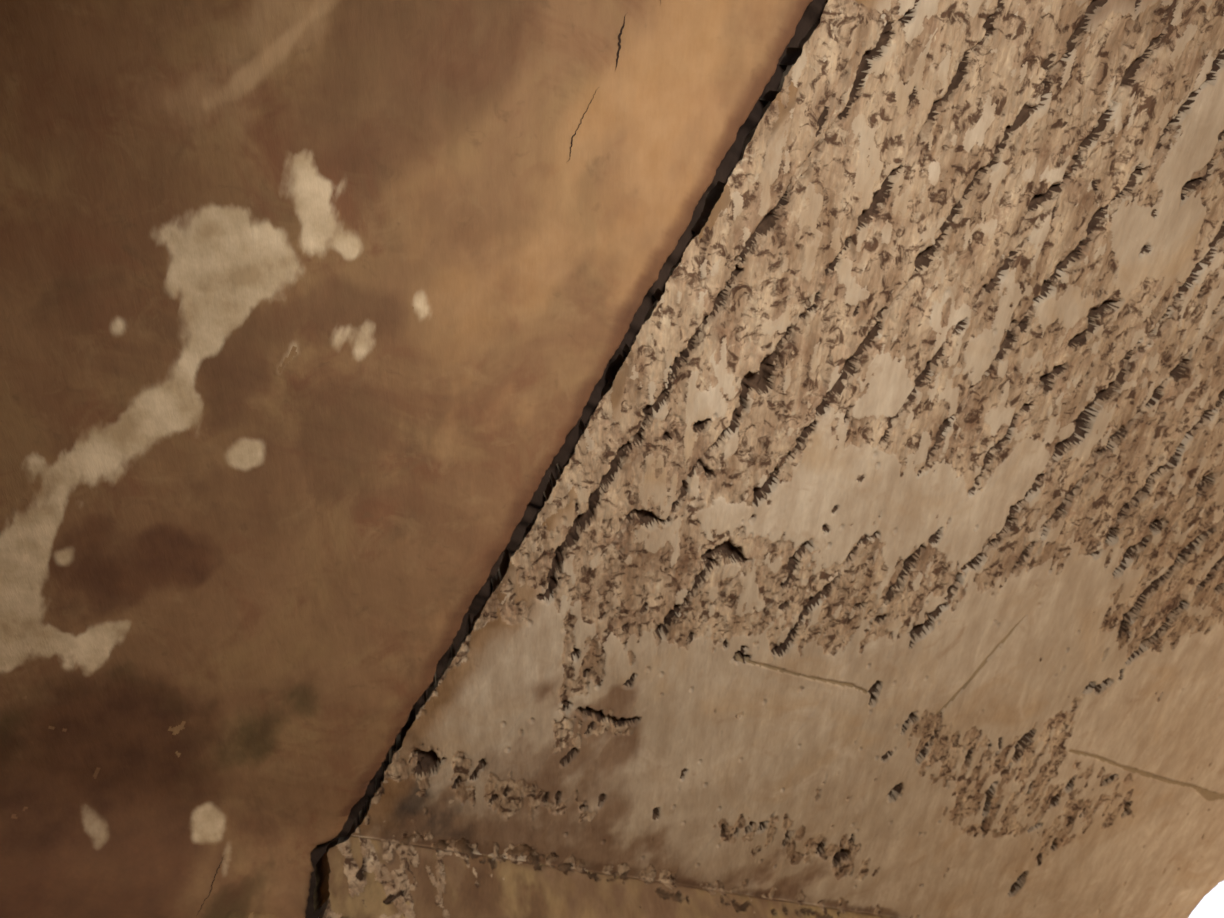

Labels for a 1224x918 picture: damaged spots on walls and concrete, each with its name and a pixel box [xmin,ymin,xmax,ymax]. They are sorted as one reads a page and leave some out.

crack [567,91,596,162]
crack [615,12,628,70]
spalling [816,0,919,138]
water stain [982,93,997,117]
spalling [914,0,1114,273]
water stain [1060,49,1077,89]
water stain [1075,0,1198,63]
spalling [1033,164,1151,302]
water stain [0,0,974,918]
spalling [536,185,789,601]
spalling [711,292,821,449]
spalling [751,306,886,517]